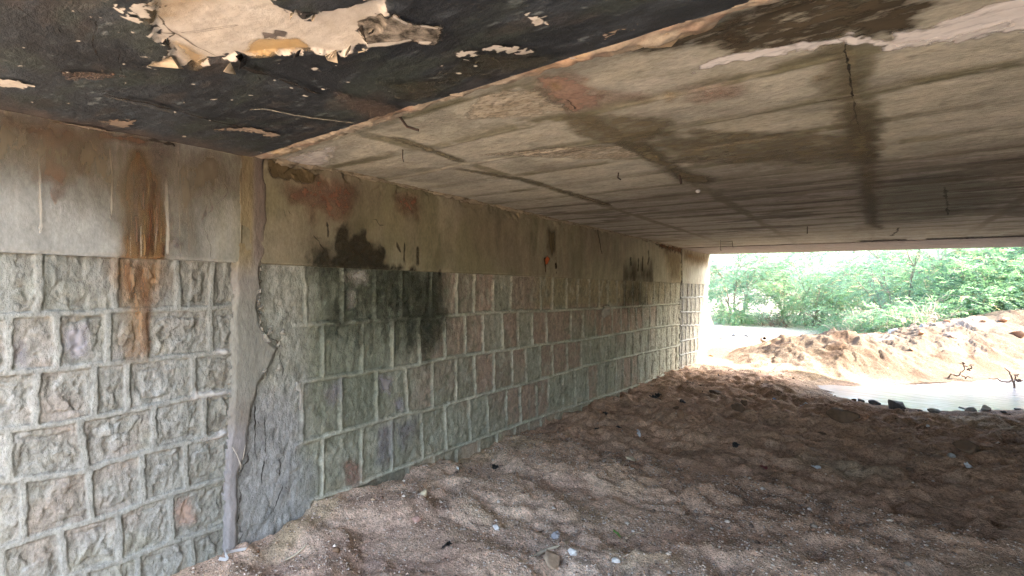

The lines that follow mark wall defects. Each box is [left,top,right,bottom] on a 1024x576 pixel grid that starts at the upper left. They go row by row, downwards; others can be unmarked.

spalling [113,0,443,75]
leakage [564,67,879,227]
crack [843,44,861,133]
rust [117,150,167,353]
leakage [313,226,446,351]